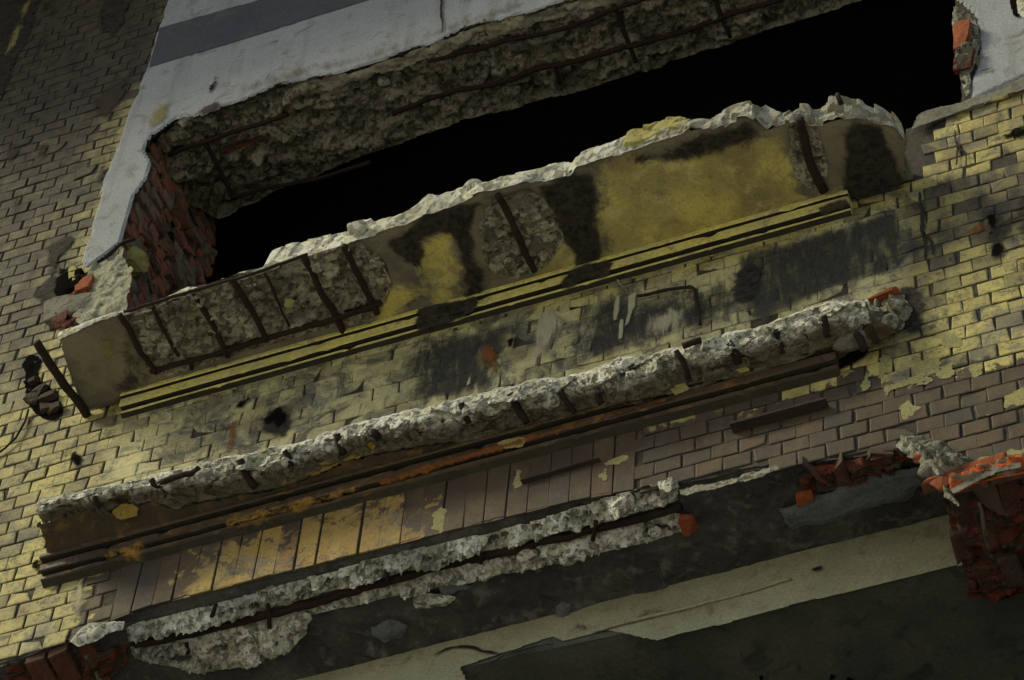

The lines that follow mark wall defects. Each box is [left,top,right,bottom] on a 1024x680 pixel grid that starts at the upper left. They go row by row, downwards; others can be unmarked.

spalling [154,0,861,219]
spalling [22,339,91,420]
rust [109,542,142,561]
leakage [262,405,292,437]
rust [226,487,355,527]
spalling [5,465,780,680]
leakage [388,197,514,403]
spalling [35,286,913,523]
spalling [57,92,906,377]
rust [380,398,666,485]
leakage [534,309,563,363]
leakage [539,174,902,356]